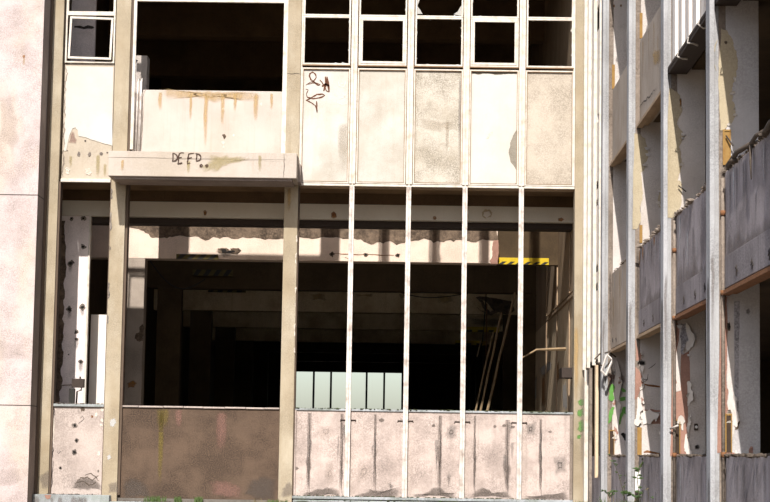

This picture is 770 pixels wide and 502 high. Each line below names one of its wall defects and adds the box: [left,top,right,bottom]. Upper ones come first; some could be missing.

peeling [718,28,738,130]
flaking render [61,100,108,176]
peeling [632,133,650,229]
peeling [656,88,686,218]
flaking render [129,226,284,255]
flaking render [296,228,499,264]
peeling [634,340,661,435]
peeling [670,322,695,456]
peeling [717,297,740,454]
water stain [308,420,343,496]
water stain [474,433,506,497]